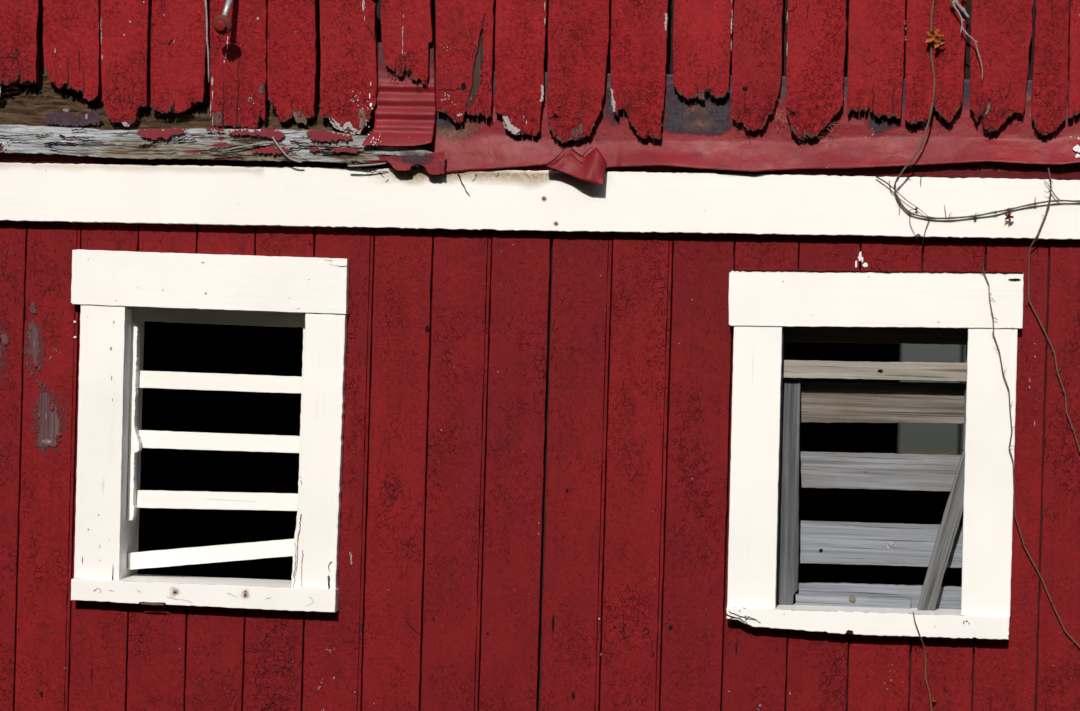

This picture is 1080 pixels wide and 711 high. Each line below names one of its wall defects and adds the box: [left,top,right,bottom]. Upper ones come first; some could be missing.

peeling [24,302,64,452]